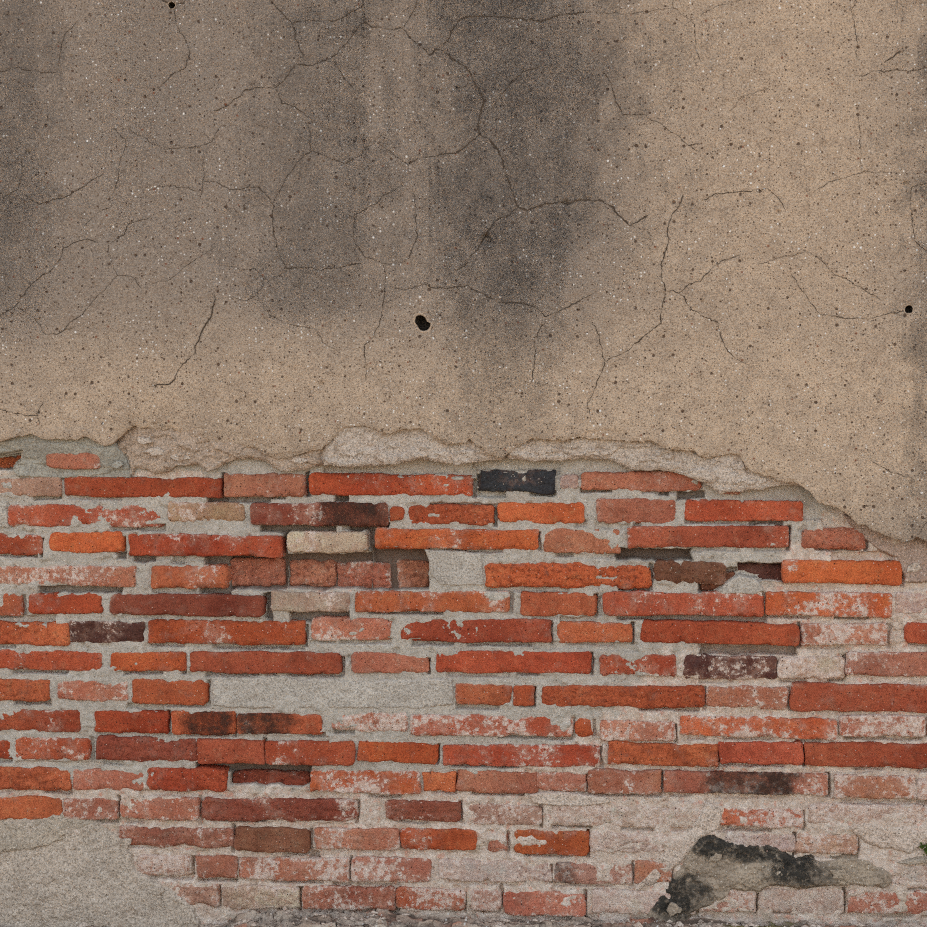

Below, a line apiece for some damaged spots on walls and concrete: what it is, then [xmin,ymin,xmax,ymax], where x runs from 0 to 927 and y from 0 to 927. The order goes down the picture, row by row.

crack [851,1,925,77]
crack [0,0,740,386]
crack [587,188,903,414]
flaking render [0,425,803,494]
flaking render [843,514,927,583]
peeling [0,812,201,927]
leakage [653,874,710,918]
leakage [693,835,828,885]
peeling [645,837,892,923]
peeling [850,822,927,865]